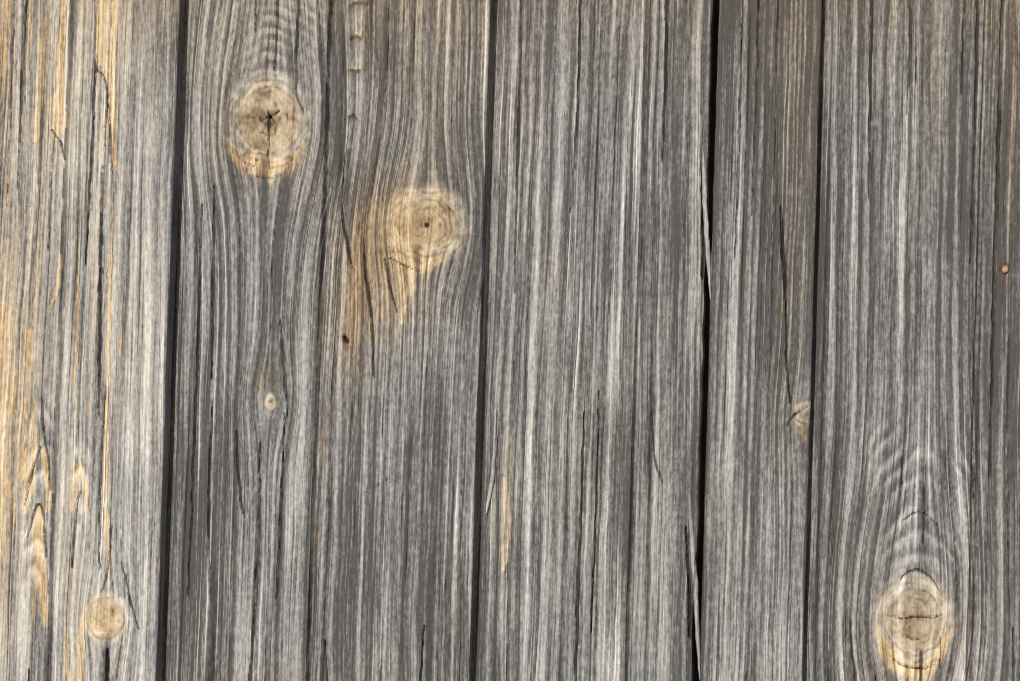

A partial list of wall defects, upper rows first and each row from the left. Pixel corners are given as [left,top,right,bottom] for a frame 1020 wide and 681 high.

crack [23,399,51,558]
crack [47,61,139,629]
crack [187,185,288,681]
crack [340,164,417,378]
crack [684,527,692,637]
crack [698,161,706,280]
crack [734,0,760,254]
crack [779,206,808,426]